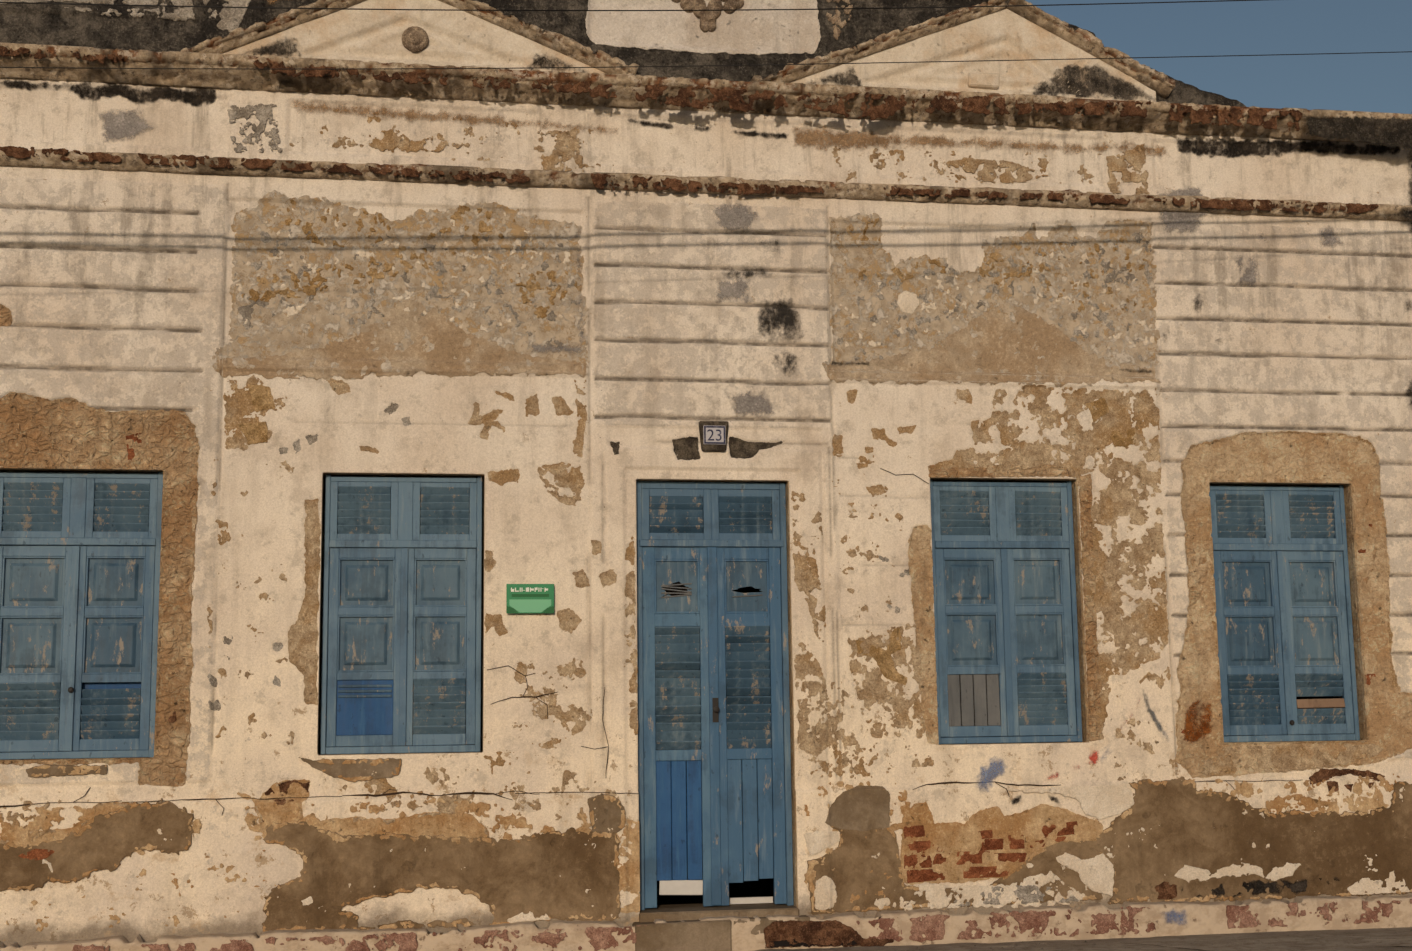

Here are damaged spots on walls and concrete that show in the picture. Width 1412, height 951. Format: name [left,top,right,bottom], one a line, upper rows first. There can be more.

peeling [29,148,245,169]
leakage [0,79,584,172]
flaking render [280,107,520,180]
leakage [715,204,778,245]
peeling [869,148,1094,201]
leakage [734,116,1412,233]
peeling [1256,200,1379,214]
leakage [1321,229,1339,246]
leakage [717,269,800,374]
leakage [733,392,772,415]
flaking render [0,190,647,951]
flaking render [791,213,1412,943]